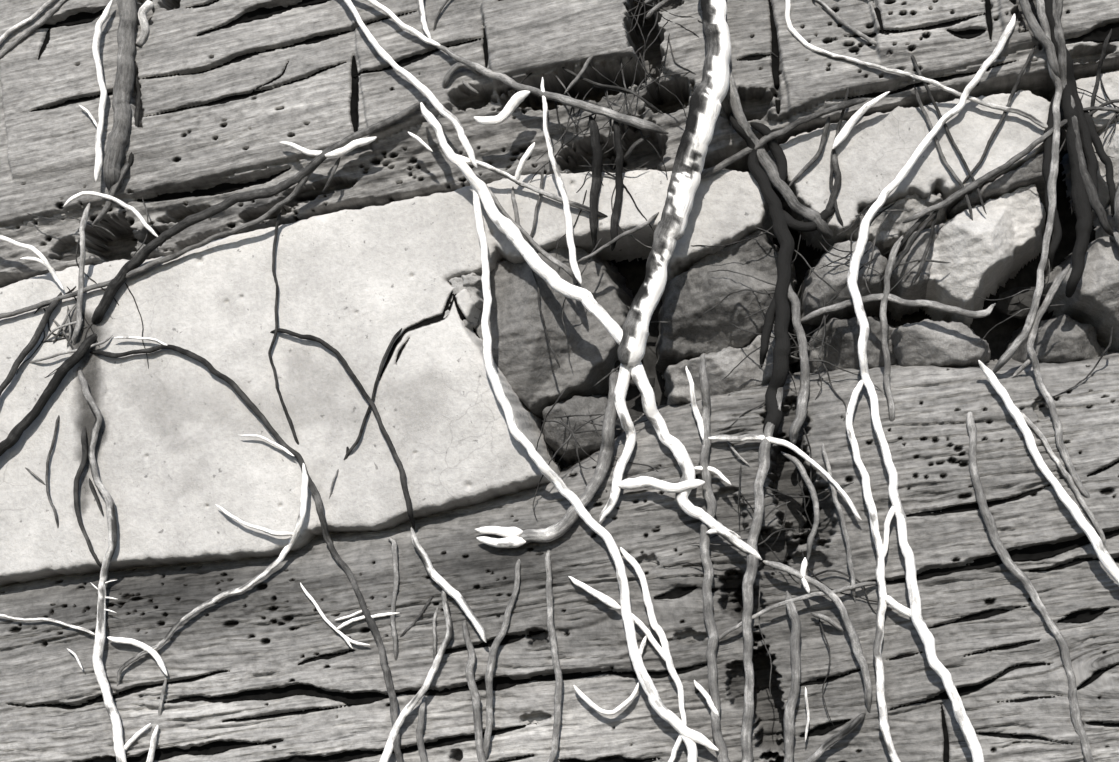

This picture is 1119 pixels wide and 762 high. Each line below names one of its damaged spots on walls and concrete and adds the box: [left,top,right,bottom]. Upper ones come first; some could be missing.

crack [38,8,105,60]
crack [186,0,326,37]
crack [143,11,485,117]
crack [31,91,113,112]
crack [379,291,480,381]
crack [906,484,1051,517]
crack [869,529,1119,584]
crack [445,630,545,654]
crack [889,606,1119,711]
crack [8,650,707,762]
crack [800,719,851,737]
crack [976,722,1119,745]